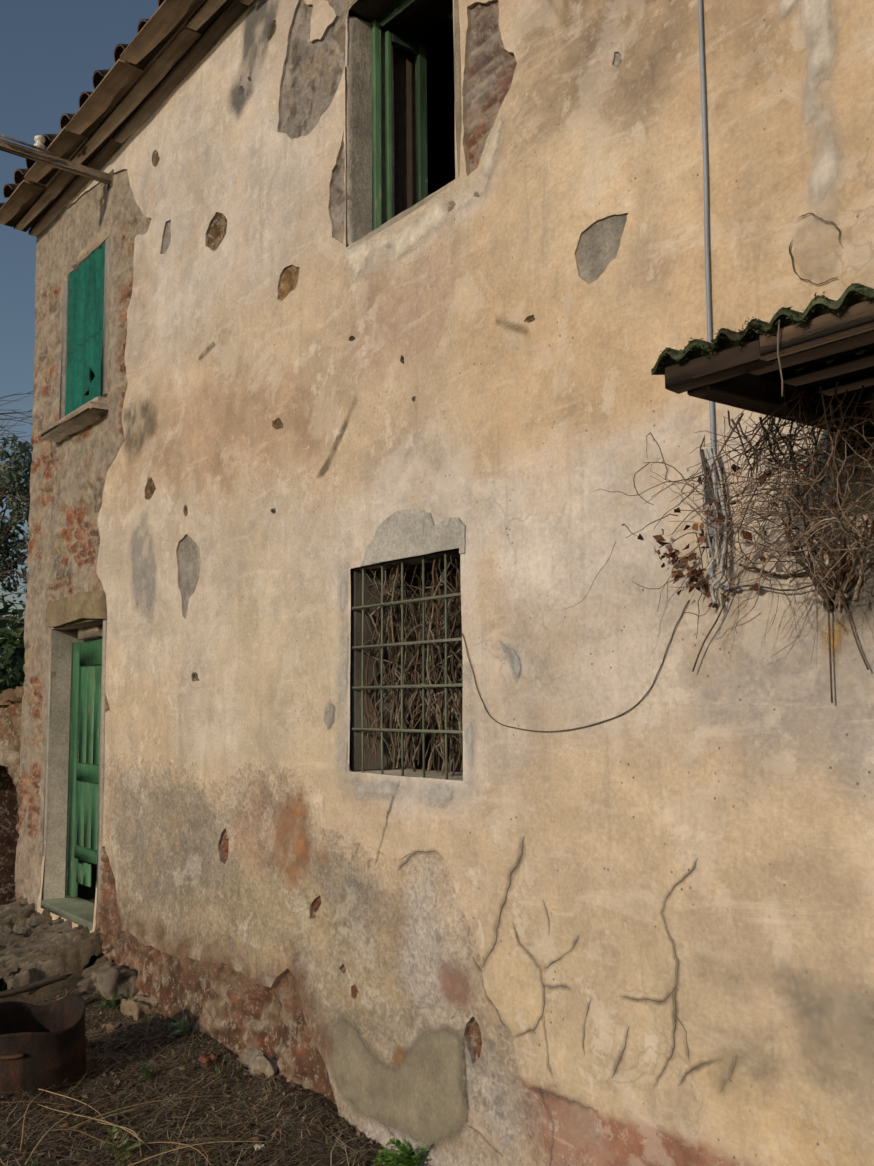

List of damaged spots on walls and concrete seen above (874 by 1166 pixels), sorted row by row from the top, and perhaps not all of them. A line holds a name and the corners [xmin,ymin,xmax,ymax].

peeling [267,0,357,140]
peeling [462,0,517,178]
water stain [780,0,838,203]
spalling [205,212,227,251]
spalling [277,264,300,301]
peeling [574,213,628,284]
peeling [176,534,201,619]
crack [376,780,443,870]
peeling [87,749,546,1166]
crack [473,836,738,1163]